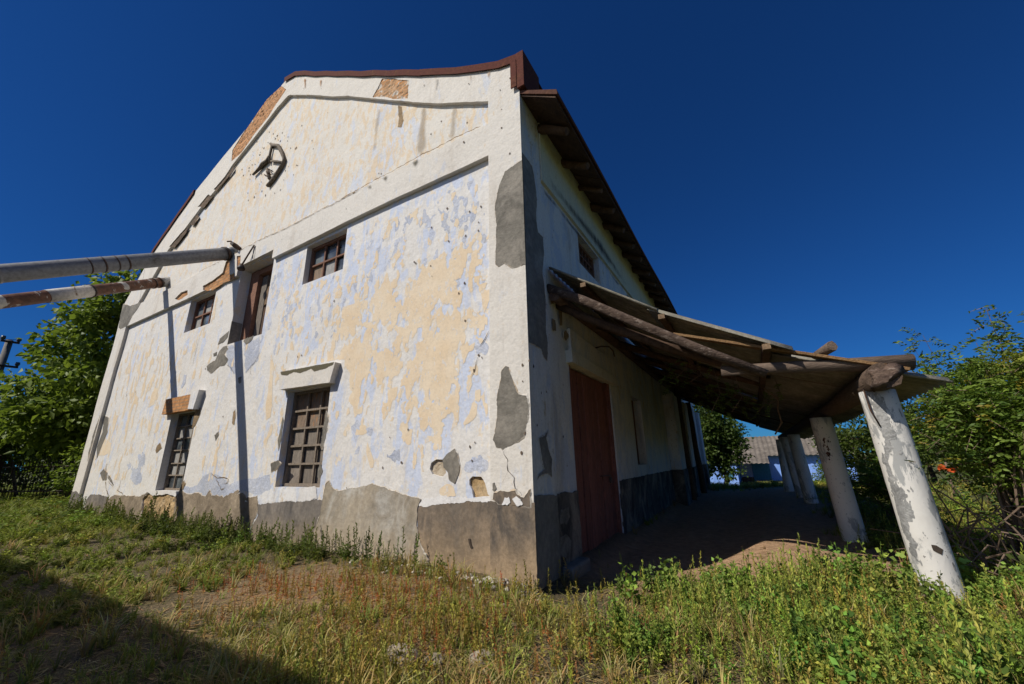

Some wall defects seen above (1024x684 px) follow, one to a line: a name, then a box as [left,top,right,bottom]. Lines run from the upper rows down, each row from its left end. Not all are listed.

flaking render [170,86,297,248]
flaking render [373,79,409,128]
peeling [94,180,532,535]
peeling [868,393,928,566]